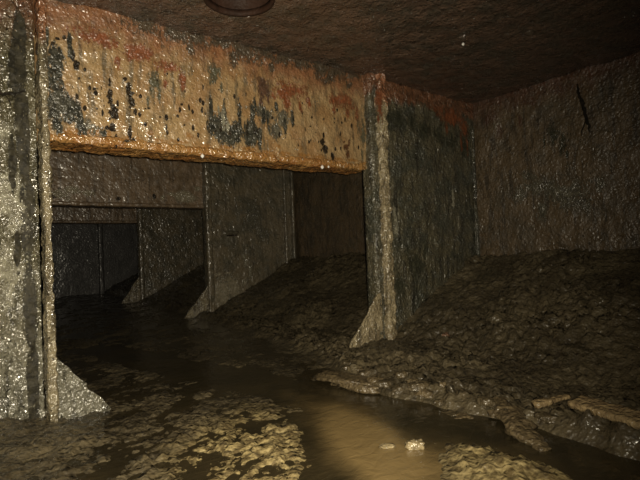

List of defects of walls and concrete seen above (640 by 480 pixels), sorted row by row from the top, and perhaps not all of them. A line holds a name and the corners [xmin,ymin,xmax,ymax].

damp [46,27,107,137]
rust [66,25,186,91]
damp [146,71,161,107]
damp [204,63,295,150]
rust [256,76,311,112]
crack [577,84,591,135]